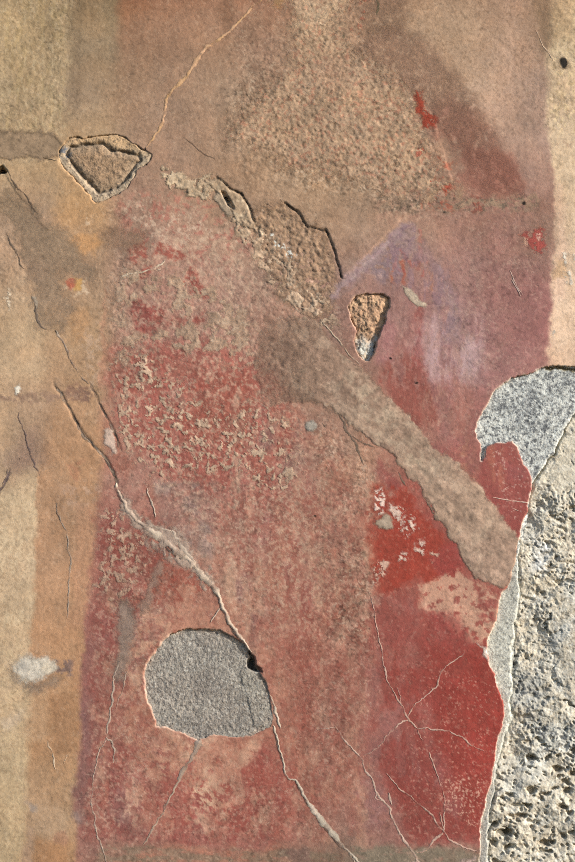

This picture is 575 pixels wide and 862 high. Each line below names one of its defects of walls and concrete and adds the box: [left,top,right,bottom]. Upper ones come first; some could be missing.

crack [145,0,284,150]
flaking render [59,135,152,203]
flaking render [161,166,223,200]
crack [186,139,329,235]
flaking render [229,203,339,329]
flaking render [348,294,389,361]
crack [32,296,252,652]
crack [90,663,126,861]
flaking render [145,629,273,740]
crack [270,696,359,862]
crack [324,597,476,862]
flaking render [475,366,575,862]